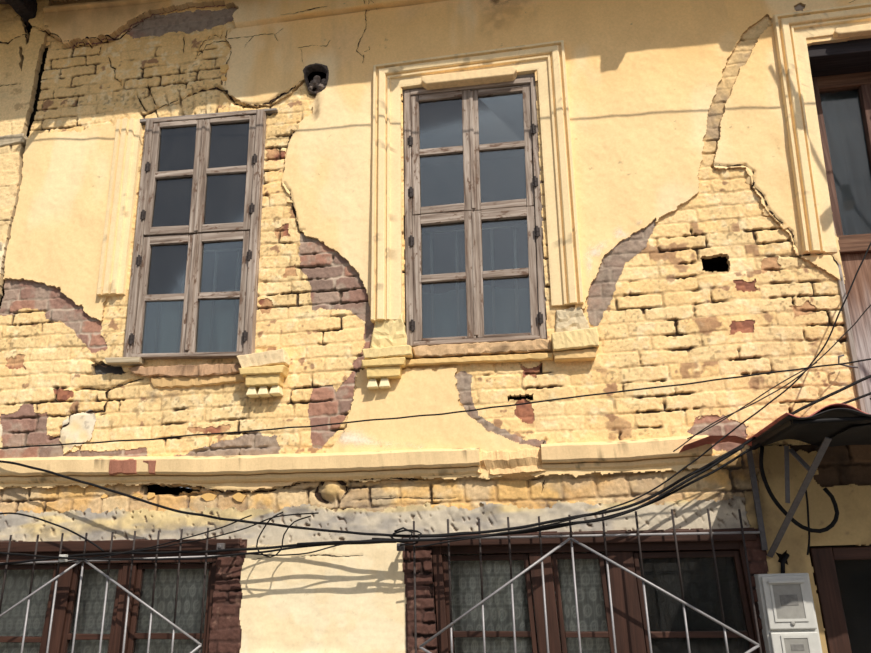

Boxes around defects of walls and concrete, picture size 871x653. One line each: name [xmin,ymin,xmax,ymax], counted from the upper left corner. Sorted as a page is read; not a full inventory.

crack [0,13,145,137]
spalling [0,6,871,515]